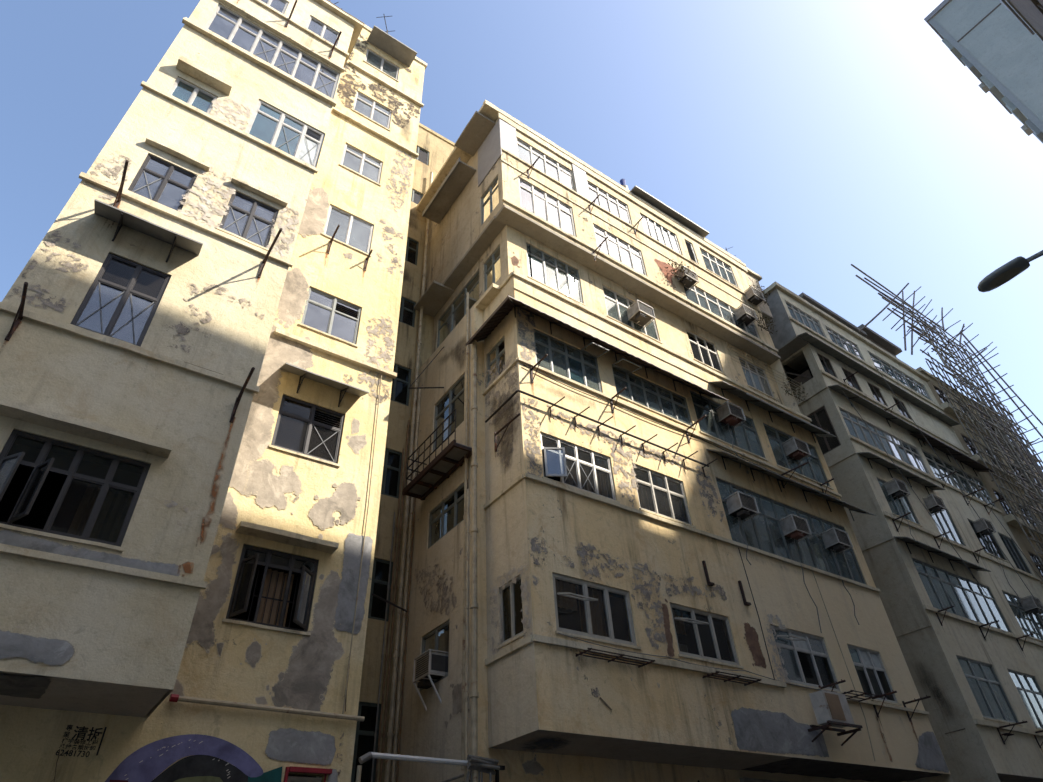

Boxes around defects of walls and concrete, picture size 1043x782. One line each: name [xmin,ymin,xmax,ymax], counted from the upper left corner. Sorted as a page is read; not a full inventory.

spalling [337,34,420,128]
peeling [376,150,413,274]
peeling [8,231,88,312]
rust [201,417,235,541]
peeling [166,186,330,657]
peeling [307,481,361,539]
peeling [485,308,682,507]
peeling [695,466,724,522]
peeling [240,638,267,669]
peeling [563,542,727,657]